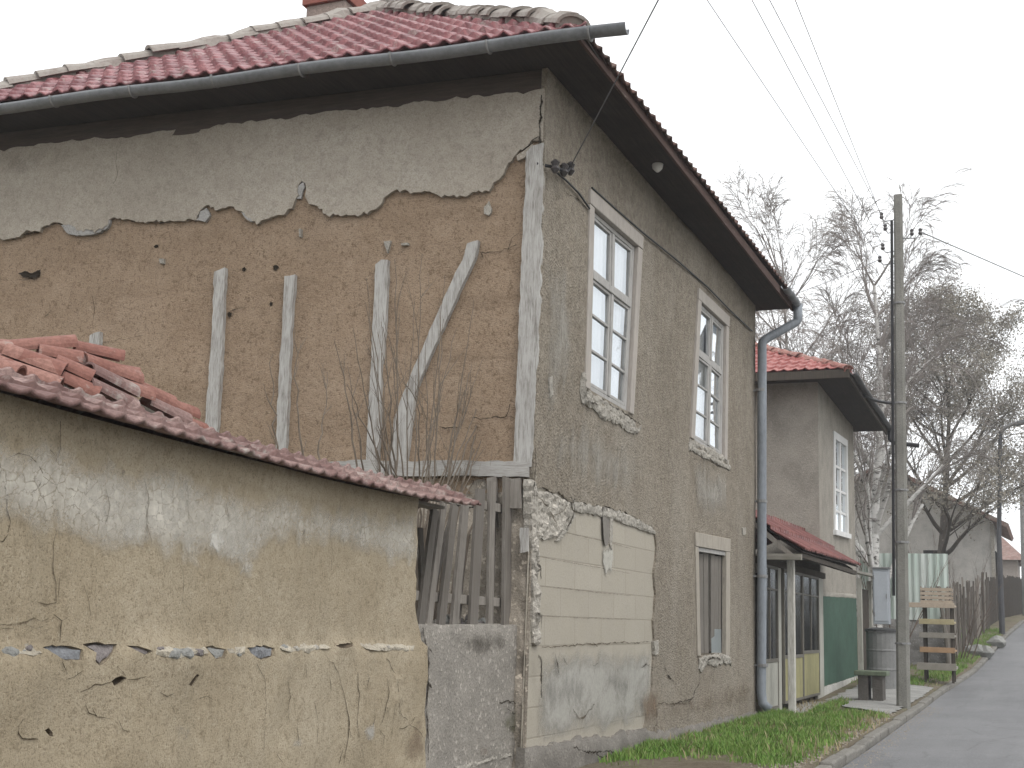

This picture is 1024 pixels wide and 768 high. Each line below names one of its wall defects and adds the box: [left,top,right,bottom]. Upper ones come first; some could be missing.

crack [522,95,543,157]
flaking render [0,141,539,462]
crack [0,421,61,542]
spalling [43,642,115,666]
spalling [206,646,226,659]
spalling [248,645,273,660]
crack [257,628,432,764]
flaking render [393,476,659,748]